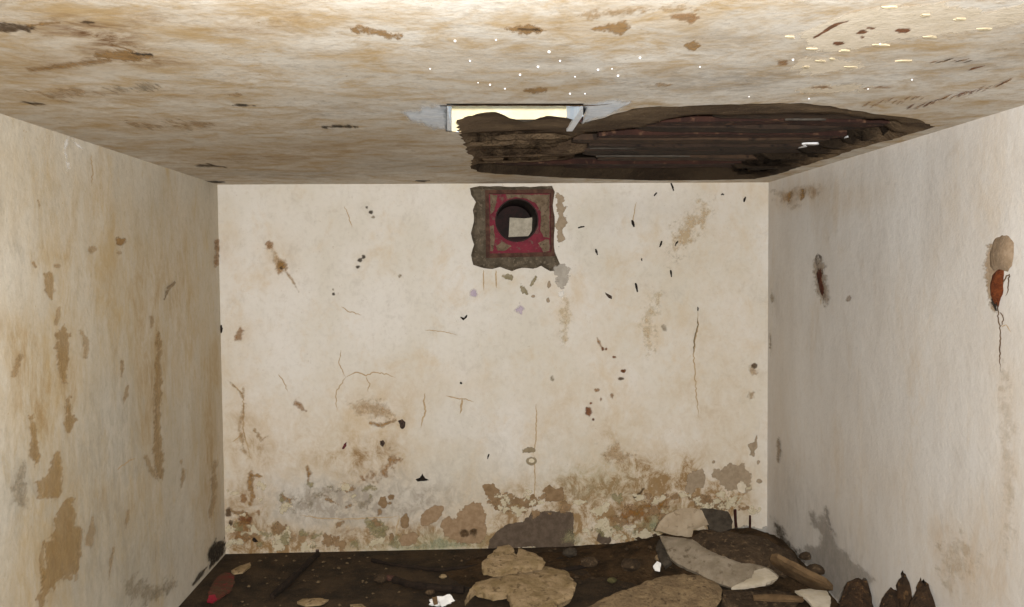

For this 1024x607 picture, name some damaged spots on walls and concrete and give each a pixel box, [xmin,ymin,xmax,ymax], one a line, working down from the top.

leakage [0,22,59,32]
leakage [351,25,403,39]
leakage [509,24,543,34]
leakage [586,9,645,35]
leakage [672,9,698,23]
leakage [29,45,152,71]
flaking render [457,2,1024,181]
leakage [583,101,630,122]
crack [335,352,393,407]
crack [692,317,700,417]
leakage [523,447,537,465]
peeling [225,436,767,552]